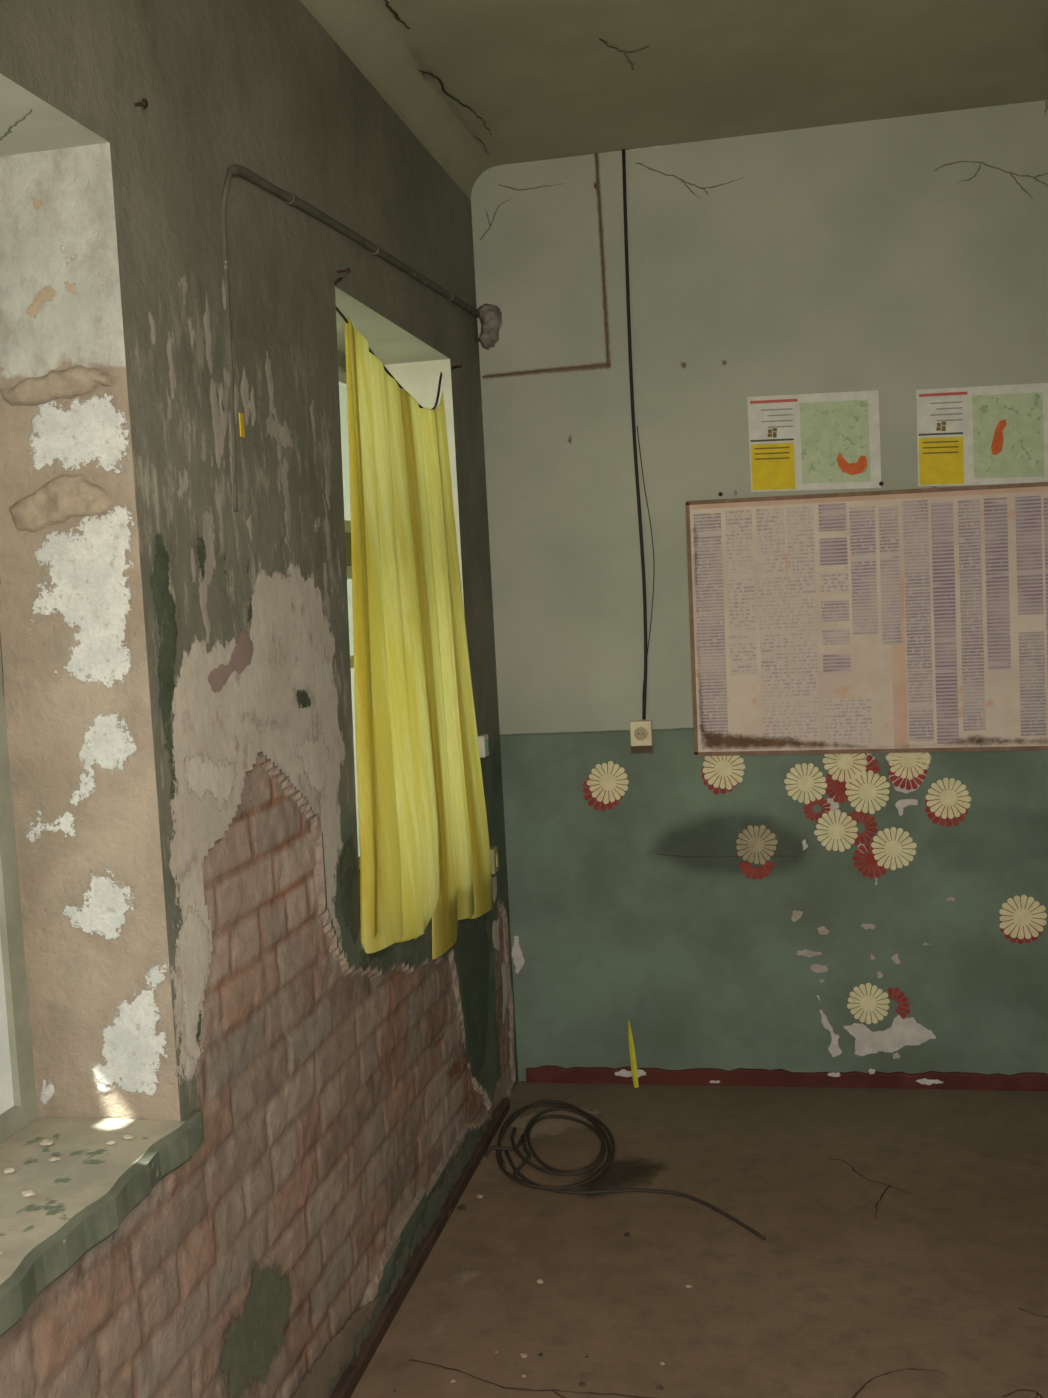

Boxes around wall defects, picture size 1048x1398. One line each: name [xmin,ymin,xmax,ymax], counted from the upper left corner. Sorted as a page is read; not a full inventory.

crack [385,0,410,30]
crack [417,69,491,152]
crack [636,162,743,198]
crack [935,161,1048,199]
spalling [26,245,75,318]
flaking render [0,274,525,1398]
spalling [796,949,936,1077]
peeling [615,1069,646,1077]
crack [409,1359,652,1398]
crack [852,1368,945,1398]